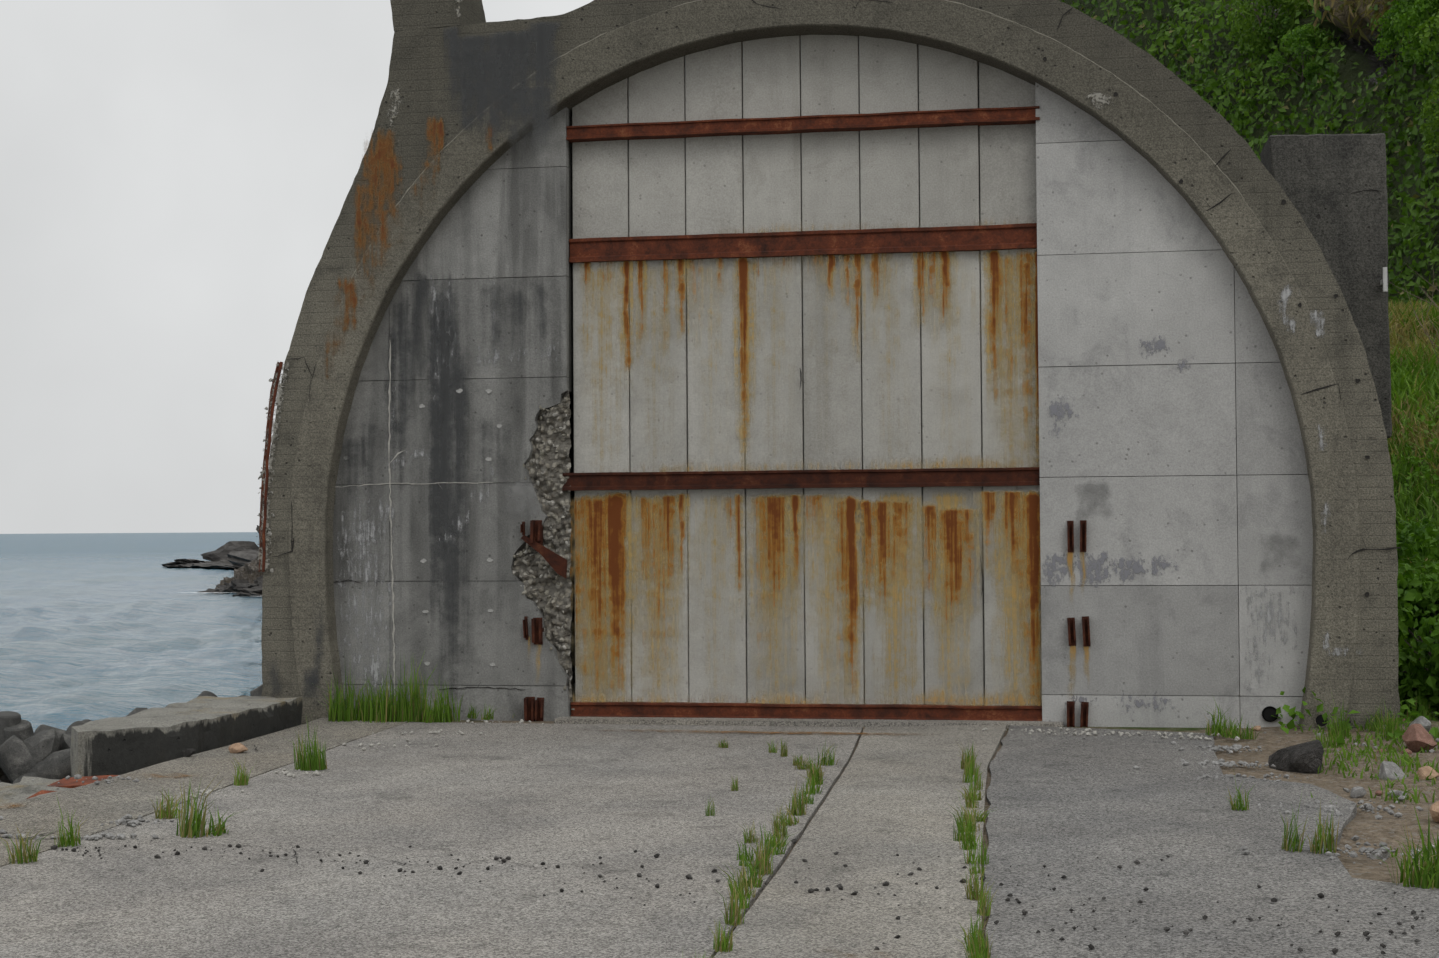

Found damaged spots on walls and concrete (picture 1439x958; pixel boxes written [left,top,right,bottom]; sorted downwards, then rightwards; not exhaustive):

water stain [337,501,394,690]
rust [326,118,444,364]
water stain [388,274,555,652]
spalling [512,391,574,710]
rust [570,493,690,703]
rust [583,258,778,471]
rust [814,253,890,340]
rust [705,491,1041,706]
rust [913,251,954,325]
rust [984,250,1040,466]